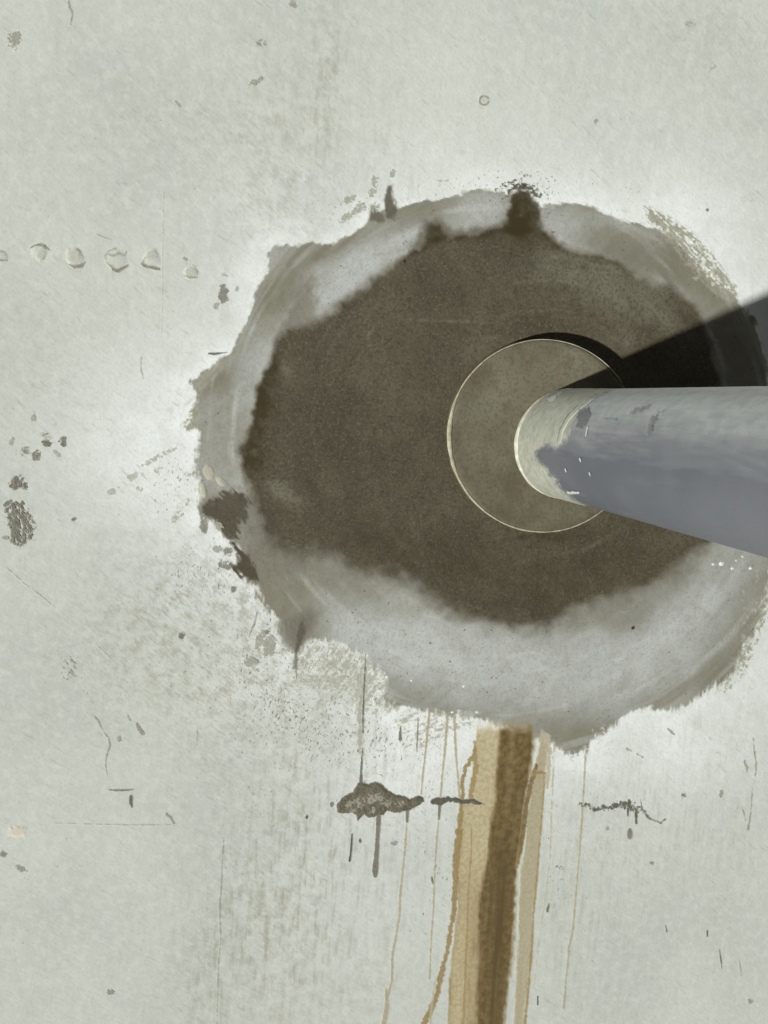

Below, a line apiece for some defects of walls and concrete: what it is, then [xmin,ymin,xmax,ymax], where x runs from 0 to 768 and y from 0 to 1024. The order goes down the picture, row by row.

peeling [339,169,395,223]
peeling [213,274,238,309]
leakage [201,173,722,630]
peeling [199,519,223,534]
peeling [212,546,232,571]
peeling [243,630,275,667]
crack [578,800,666,839]
corrosion [420,711,555,1024]